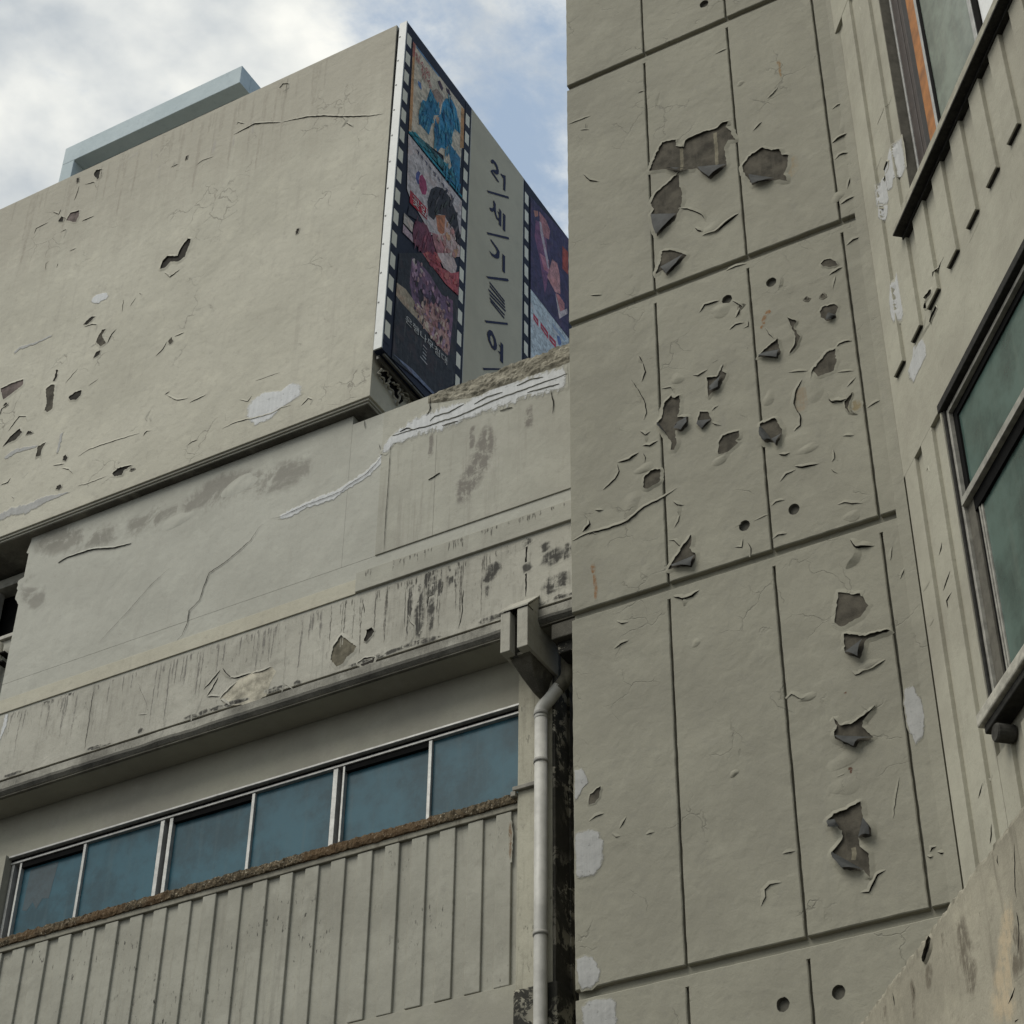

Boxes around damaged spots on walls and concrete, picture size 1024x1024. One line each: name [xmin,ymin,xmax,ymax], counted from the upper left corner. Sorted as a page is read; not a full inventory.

crack [236,113,383,133]
peeling [647,119,792,280]
peeling [158,237,194,272]
peeling [42,369,83,414]
leakage [278,365,569,520]
spalling [428,343,570,403]
peeling [654,362,730,454]
crack [183,532,256,632]
leakage [477,550,522,625]
leakage [519,538,572,607]
peeling [830,589,895,663]
peeling [823,798,878,880]